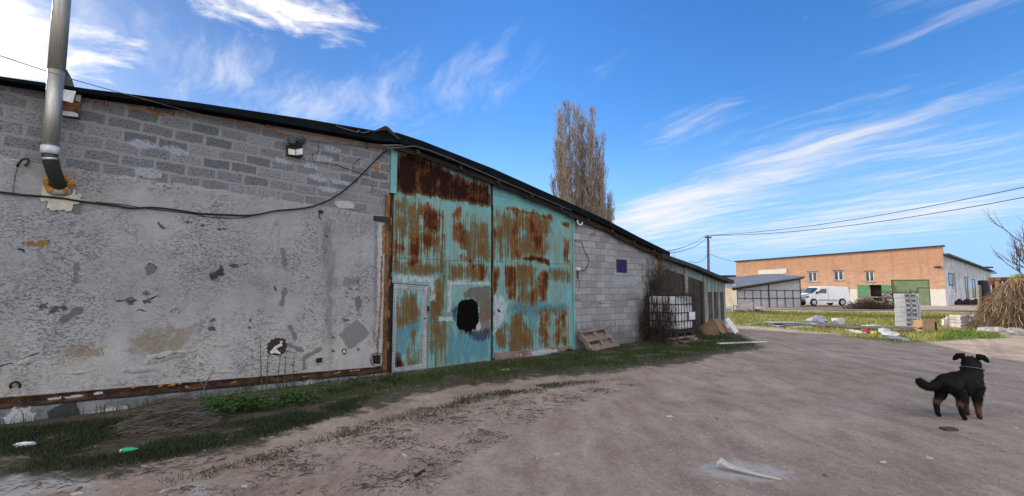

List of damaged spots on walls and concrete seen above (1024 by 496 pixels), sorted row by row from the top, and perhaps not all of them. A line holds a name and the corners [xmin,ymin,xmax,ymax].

peeling [344,221,386,367]
rust [375,154,570,368]